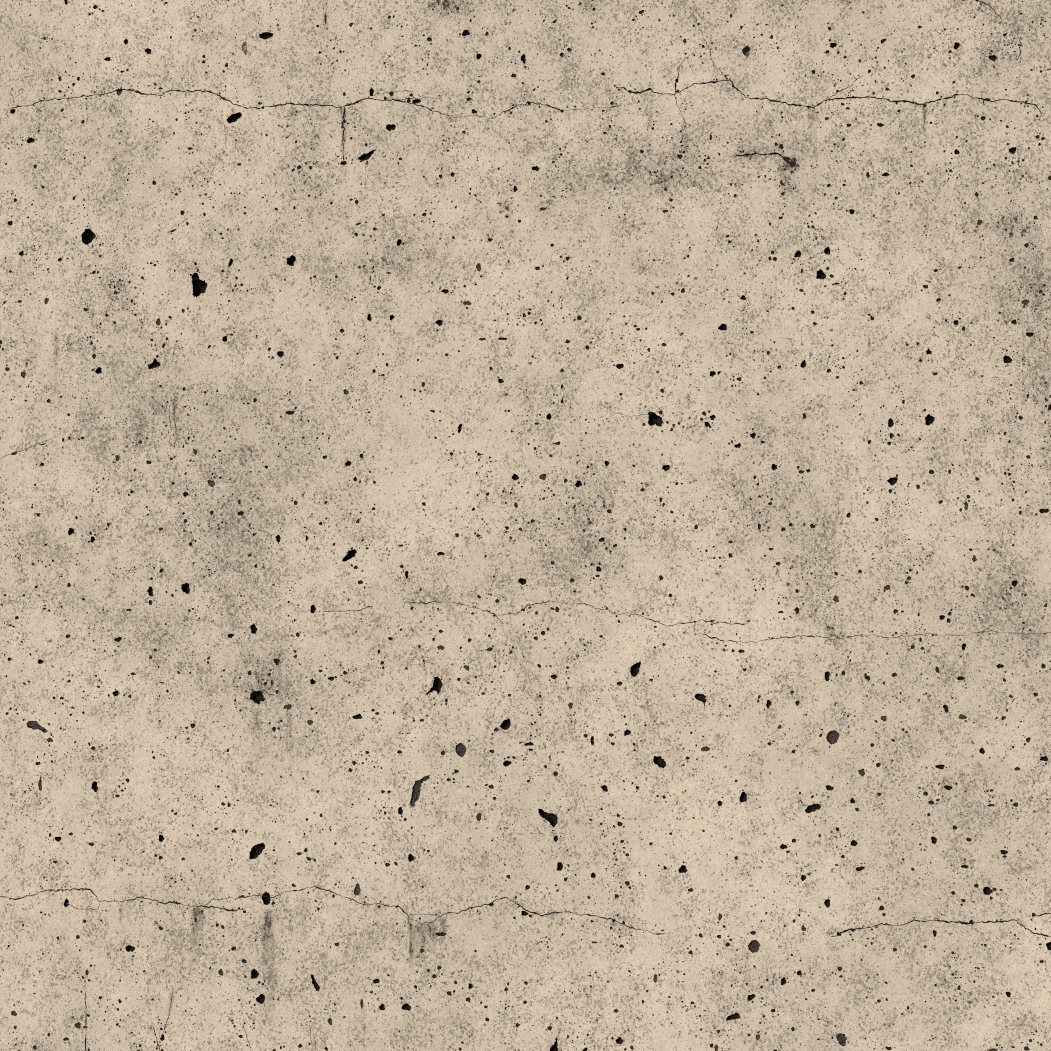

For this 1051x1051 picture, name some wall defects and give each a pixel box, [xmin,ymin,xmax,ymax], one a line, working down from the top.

crack [12,15,1041,161]
crack [0,885,665,935]
crack [831,913,1051,937]